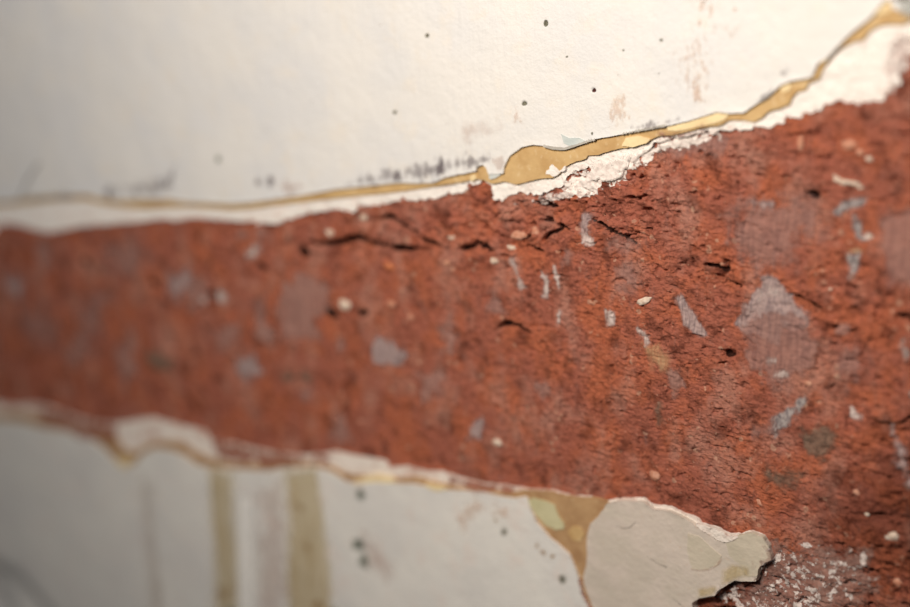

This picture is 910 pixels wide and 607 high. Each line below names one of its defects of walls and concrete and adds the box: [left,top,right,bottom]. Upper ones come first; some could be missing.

flaking render [658,0,910,141]
flaking render [0,179,485,232]
peeling [328,165,502,199]
peeling [486,124,666,201]
flaking render [666,131,728,157]
flaking render [0,403,529,498]
flaking render [421,372,445,403]
flaking render [772,398,806,436]
damp [211,472,236,607]
damp [288,471,329,607]
peeling [518,489,609,607]
peeling [583,497,774,607]